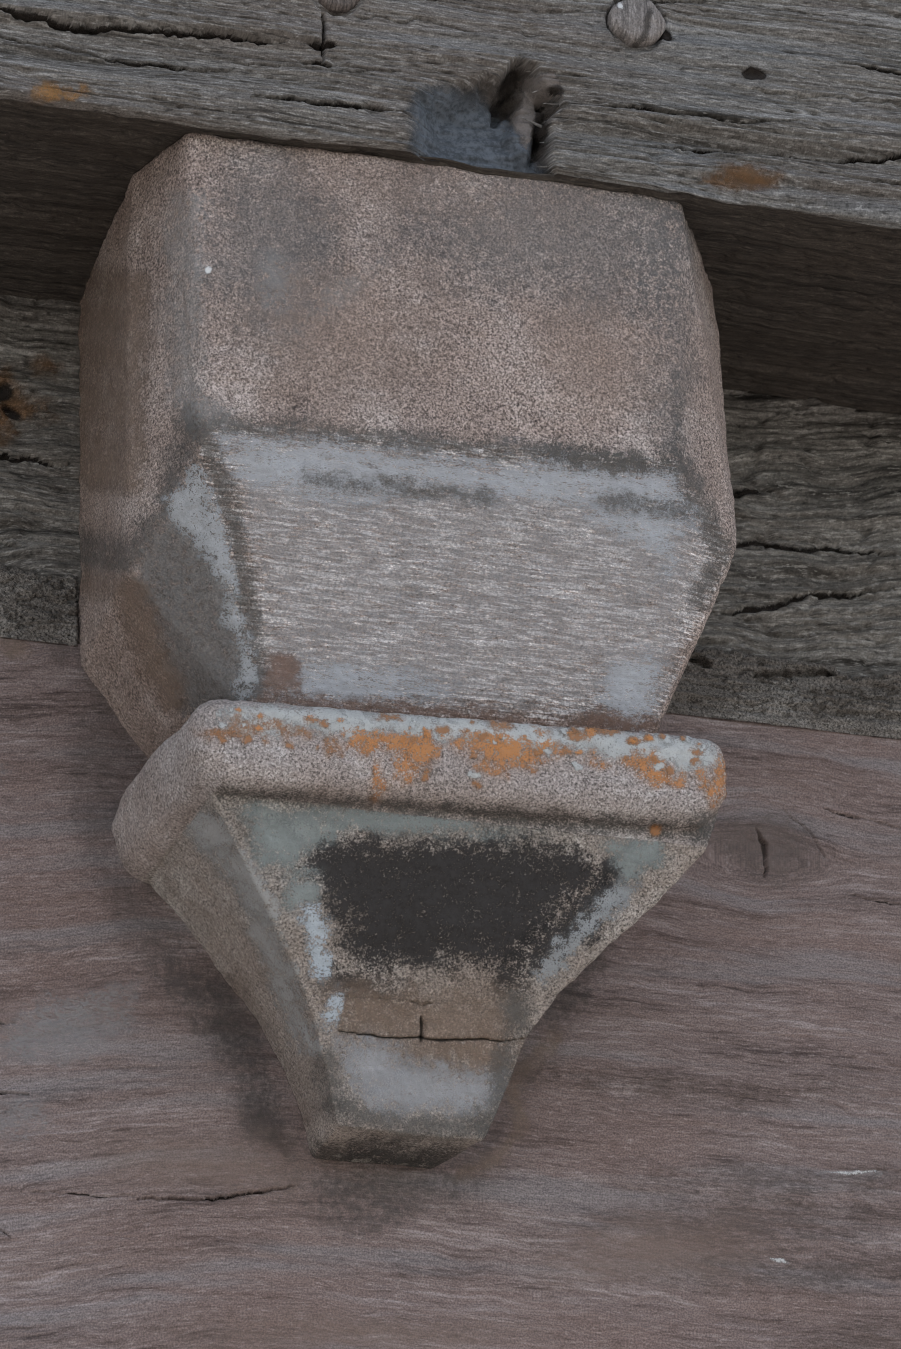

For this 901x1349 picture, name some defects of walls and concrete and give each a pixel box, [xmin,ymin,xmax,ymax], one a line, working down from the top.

crack [340,1001,516,1042]
damp [183,784,717,1171]